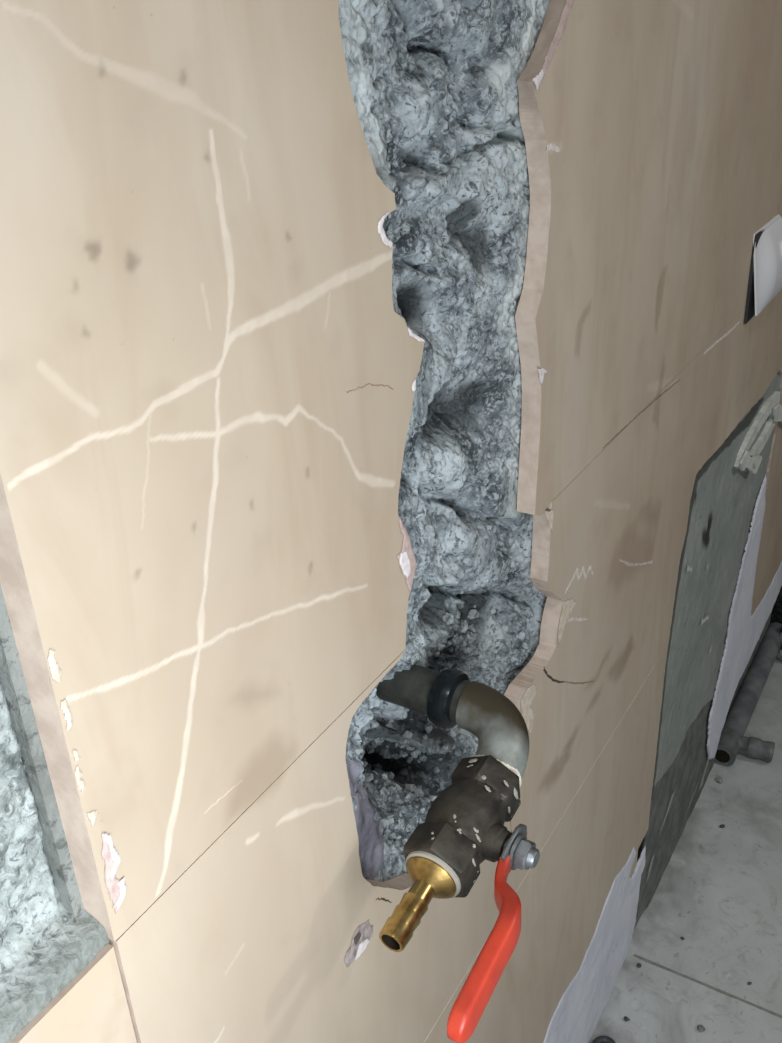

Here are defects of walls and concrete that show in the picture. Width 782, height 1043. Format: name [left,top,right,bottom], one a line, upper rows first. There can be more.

crack [347,383,394,393]
spalling [339,0,576,882]
peeling [47,649,62,683]
crack [543,667,594,684]
peeling [0,681,111,1043]
peeling [87,811,127,913]
spalling [344,920,373,967]